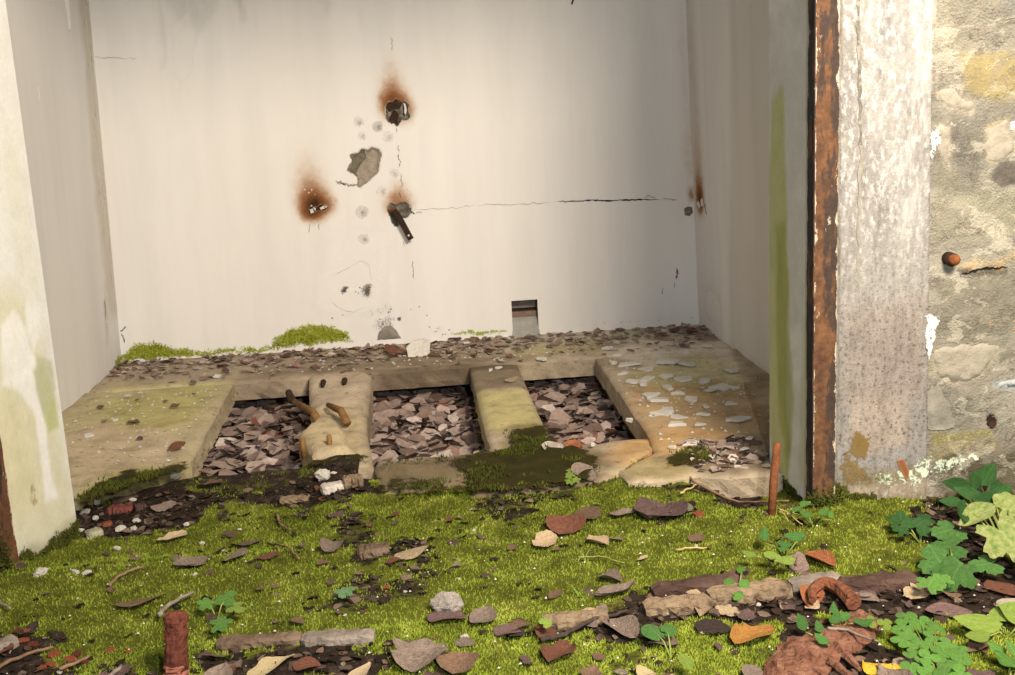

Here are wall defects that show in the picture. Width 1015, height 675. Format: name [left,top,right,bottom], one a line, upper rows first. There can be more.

corrosion [379,82,412,115]
corrosion [298,180,333,229]
spalling [337,147,382,187]
corrosion [389,191,409,204]
crack [396,131,676,214]
corrosion [690,171,707,215]